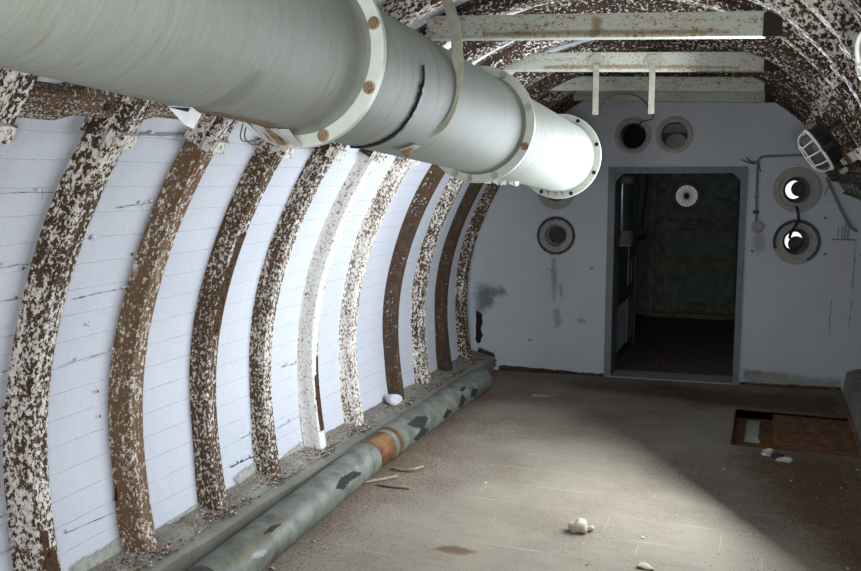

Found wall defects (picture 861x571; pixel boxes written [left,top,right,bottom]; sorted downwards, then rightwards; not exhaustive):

corrosion [214,233,246,334]
corrosion [40,530,60,571]